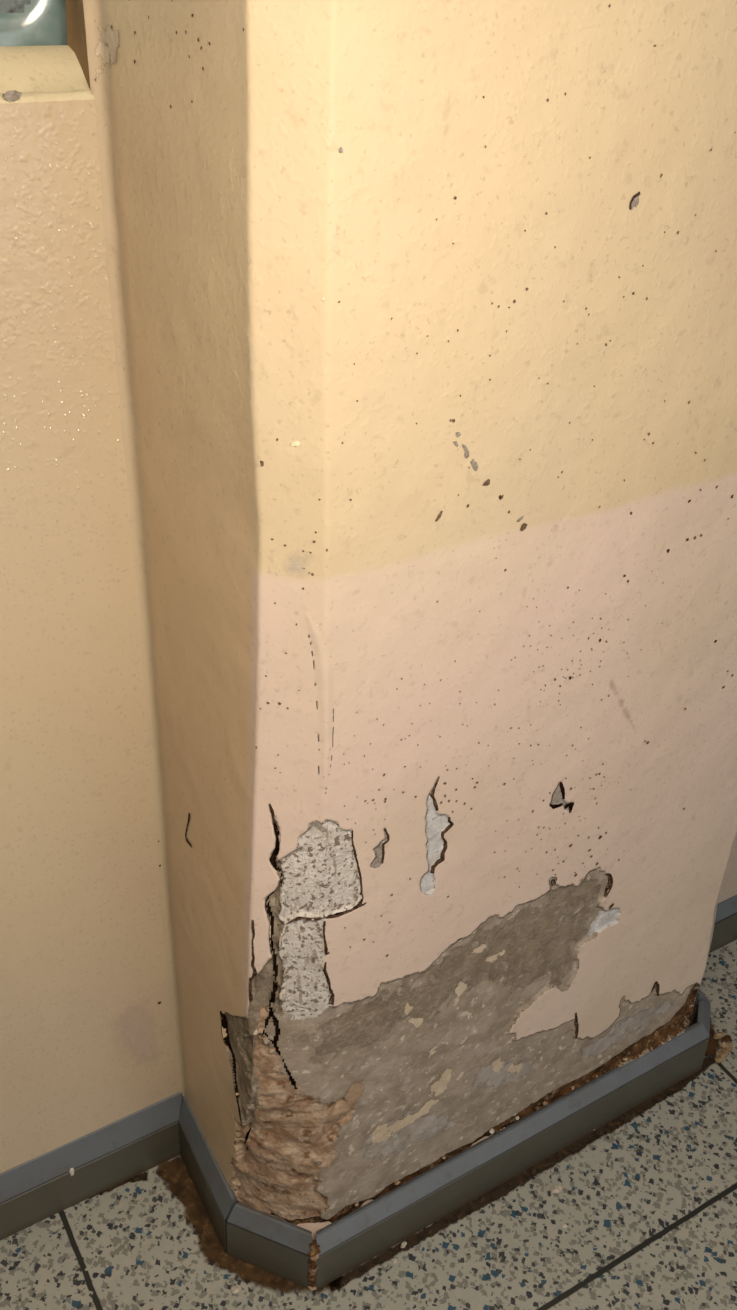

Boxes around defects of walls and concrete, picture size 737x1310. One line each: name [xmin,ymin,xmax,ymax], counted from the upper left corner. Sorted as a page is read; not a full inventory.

peeling [420,776,454,895]
peeling [549,781,575,813]
crack [262,804,366,1089]
crack [220,1011,252,1149]
flaking render [221,820,699,1221]